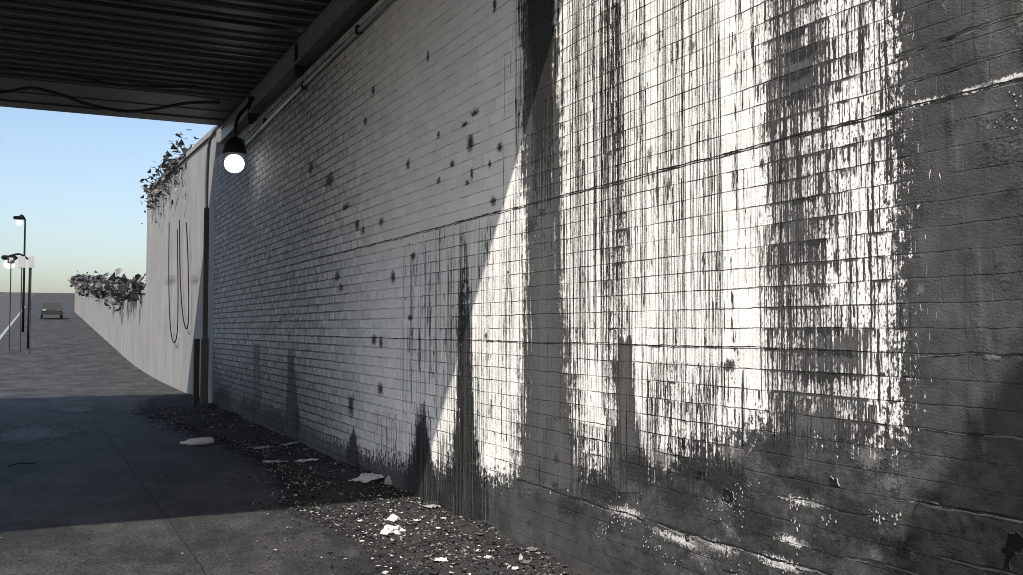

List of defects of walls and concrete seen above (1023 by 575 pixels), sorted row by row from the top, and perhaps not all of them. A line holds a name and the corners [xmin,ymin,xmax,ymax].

crack [895,12,1023,57]
crack [295,47,1023,265]
damp [375,0,947,570]
damp [758,551,804,574]
spalling [1001,532,1023,570]